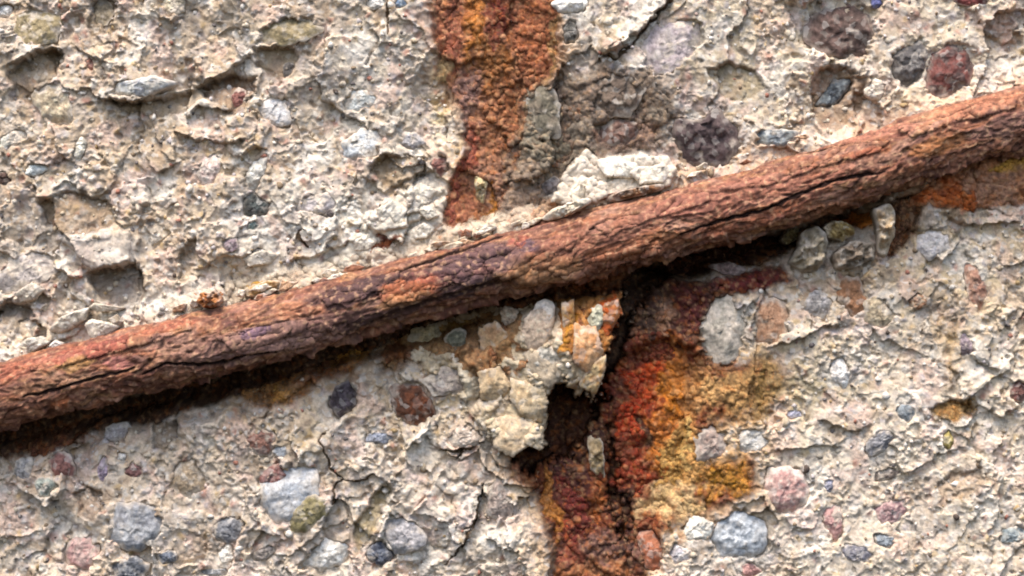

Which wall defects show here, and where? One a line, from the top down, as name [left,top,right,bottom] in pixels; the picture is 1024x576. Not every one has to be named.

rust [431,0,668,241]
rust [595,98,1018,237]
rust [887,157,1024,256]
crack [318,433,375,505]
rust [0,211,873,576]
peeling [410,267,669,536]
rust [932,397,977,421]